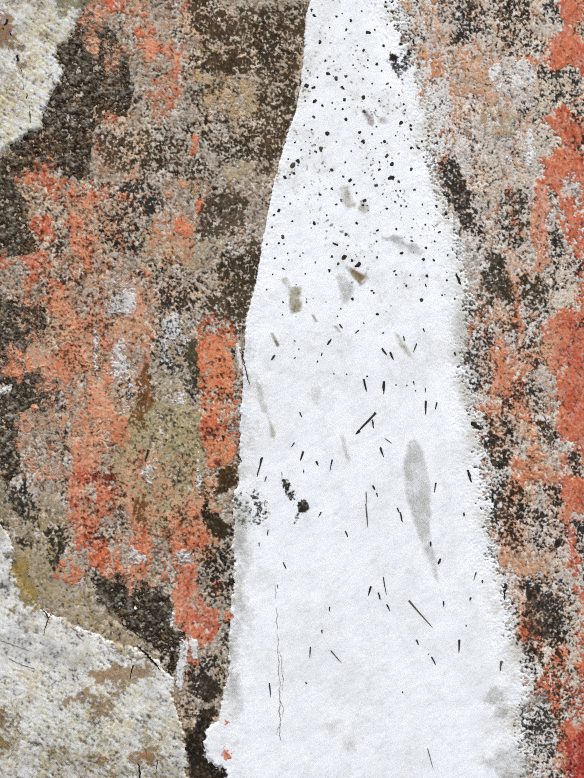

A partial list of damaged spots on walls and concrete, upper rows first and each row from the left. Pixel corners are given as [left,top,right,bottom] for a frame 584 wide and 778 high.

spalling [0,0,268,700]
crack [275,589,284,740]
damp [409,492,430,539]
peeling [398,0,584,778]